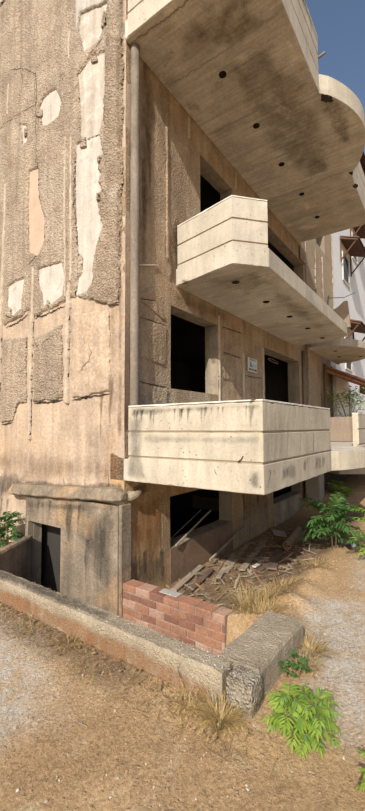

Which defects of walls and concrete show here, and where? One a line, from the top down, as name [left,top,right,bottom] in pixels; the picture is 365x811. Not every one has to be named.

peeling [36,90,62,126]
peeling [75,3,107,295]
peeling [29,169,45,256]
peeling [5,279,24,317]
peeling [39,263,64,306]